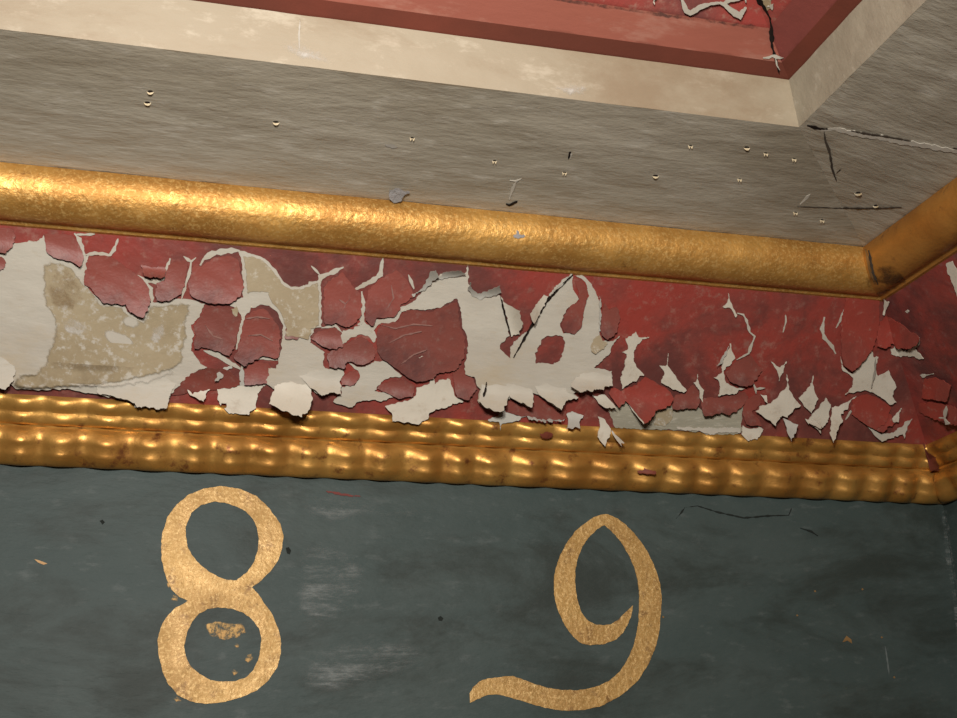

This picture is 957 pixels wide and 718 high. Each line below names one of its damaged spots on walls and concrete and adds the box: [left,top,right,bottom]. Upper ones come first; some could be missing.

peeling [681,0,747,20]
crack [721,0,783,72]
crack [807,125,957,181]
peeling [0,227,957,446]